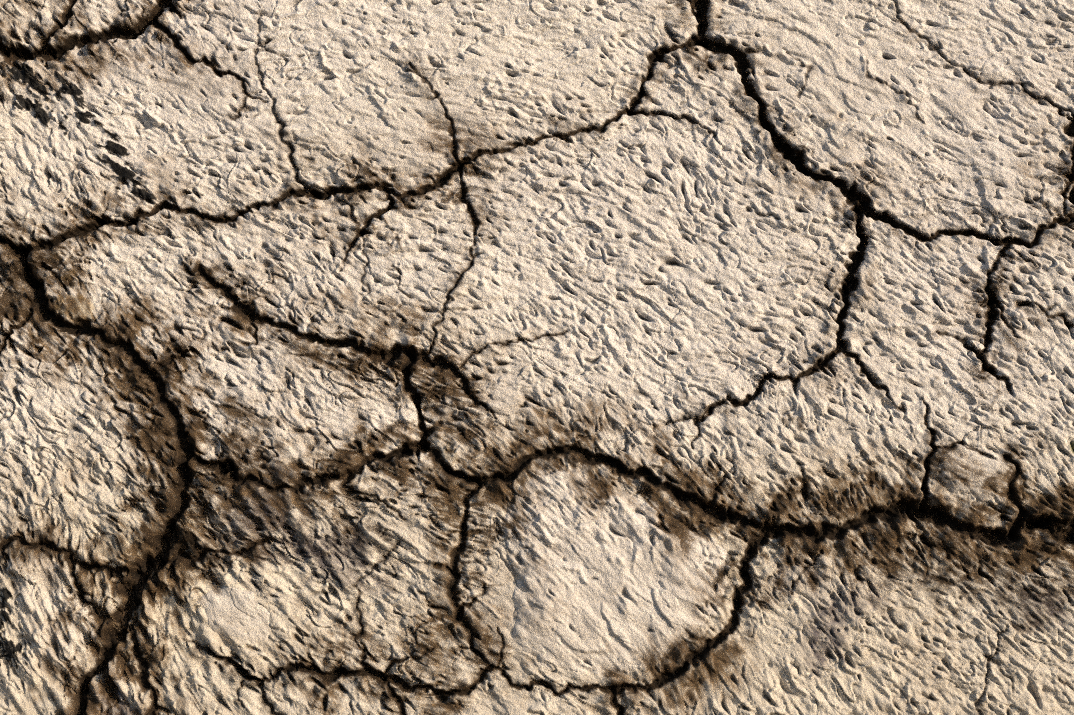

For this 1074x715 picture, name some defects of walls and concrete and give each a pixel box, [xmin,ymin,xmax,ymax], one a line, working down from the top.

water stain [266,97,641,254]
crack [0,0,1074,449]
crack [0,262,270,715]
water stain [0,194,1074,715]
crack [185,264,1074,715]